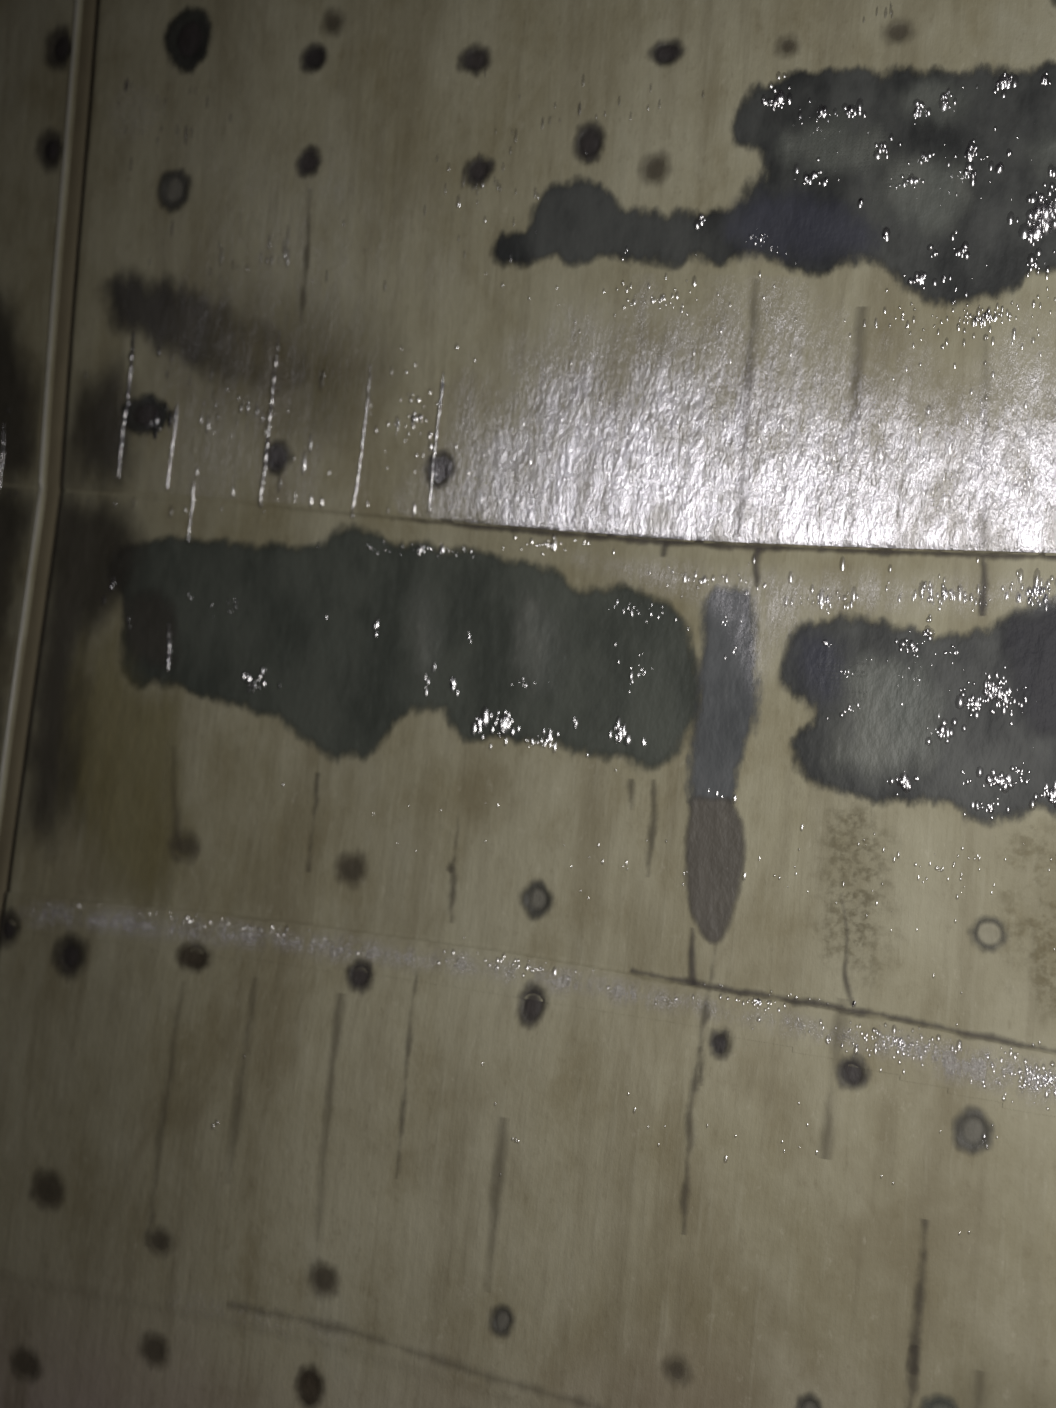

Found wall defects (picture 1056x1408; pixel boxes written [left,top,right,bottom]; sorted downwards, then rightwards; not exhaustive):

leakage [494,61,1056,304]
leakage [0,307,35,474]
leakage [111,276,345,393]
leakage [0,491,29,638]
leakage [28,504,759,942]
leakage [781,599,1056,824]
crack [674,937,1021,1045]